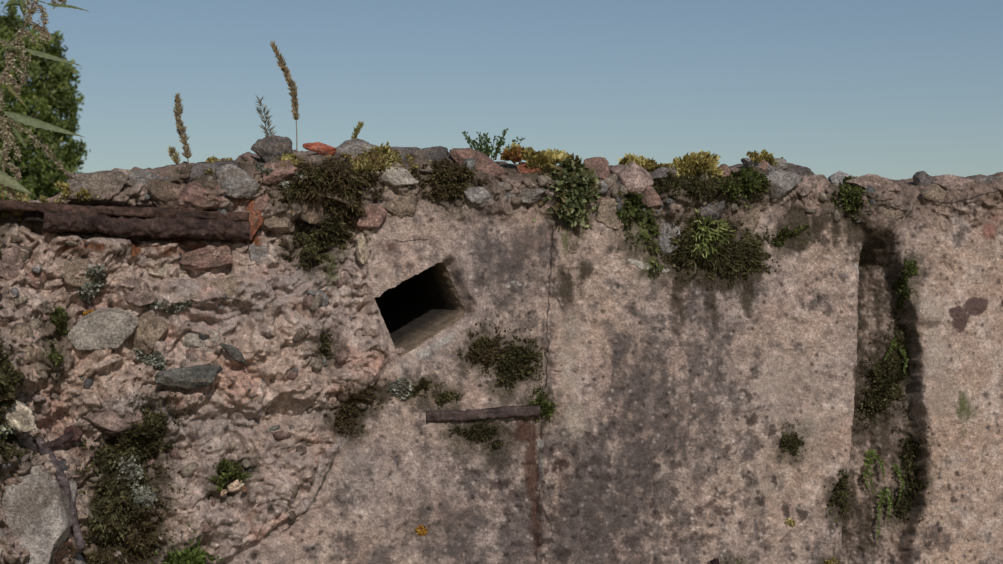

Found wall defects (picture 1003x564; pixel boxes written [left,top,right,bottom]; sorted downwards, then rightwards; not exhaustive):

crack [544,224,579,390]
leakage [648,251,763,332]
leakage [777,204,908,473]
crack [282,435,349,532]
rust [516,420,542,550]
crack [535,424,552,564]
leakage [742,475,764,506]
leakage [782,504,808,521]
leakage [833,479,884,564]